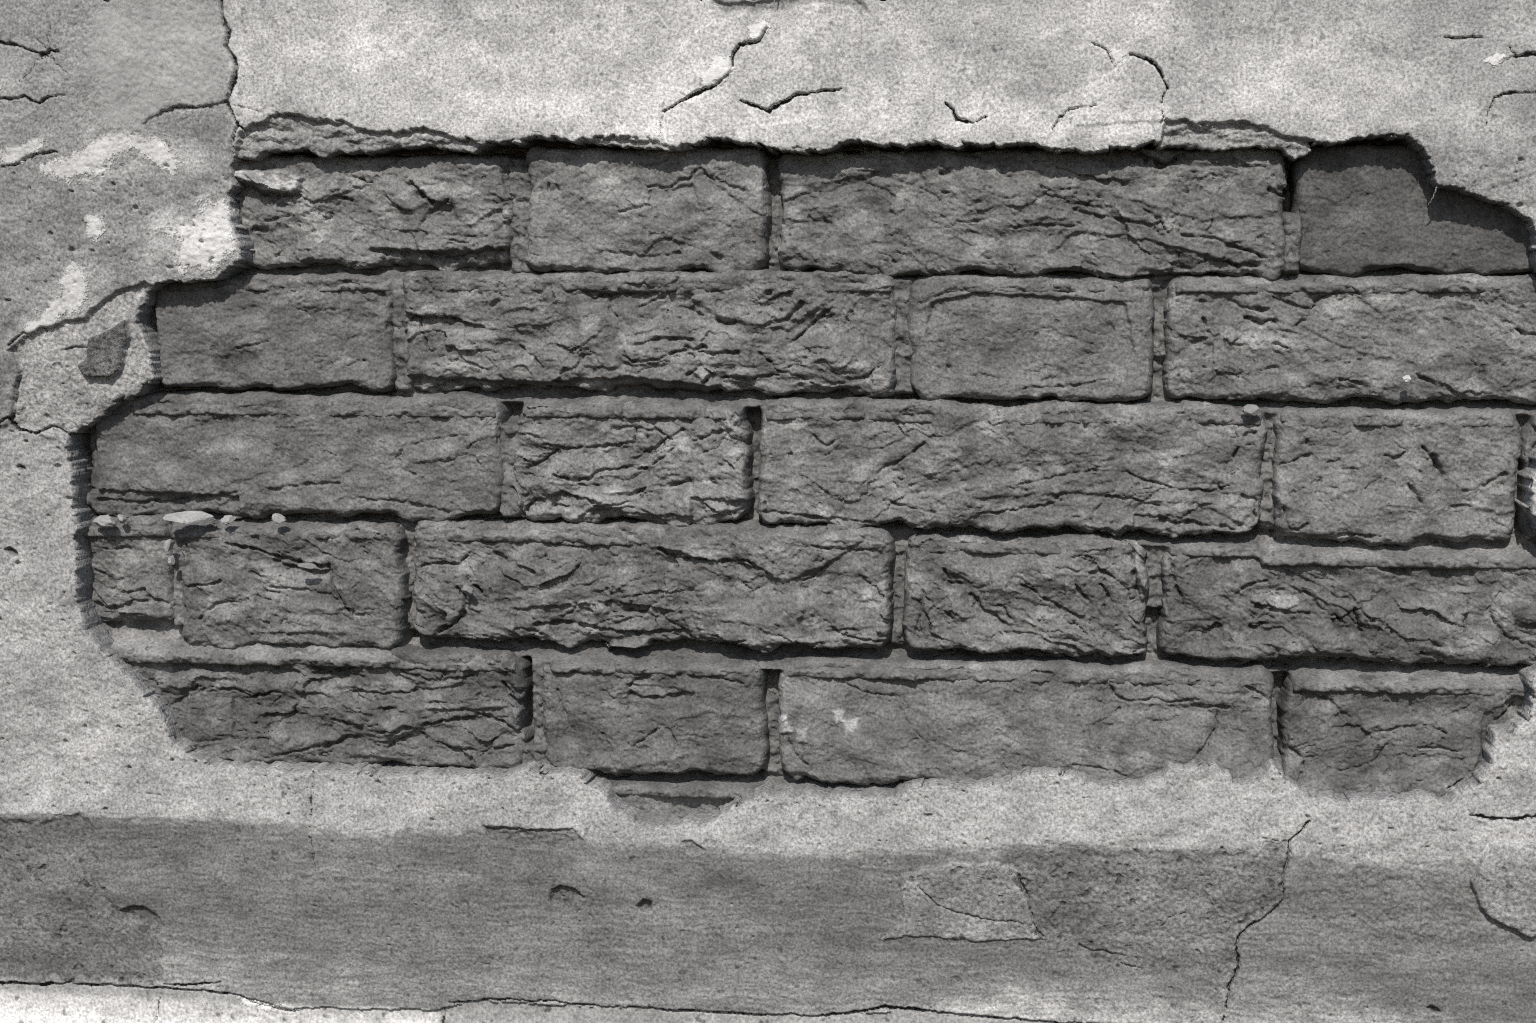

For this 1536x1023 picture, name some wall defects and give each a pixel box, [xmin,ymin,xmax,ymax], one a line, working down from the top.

crack [0,25,71,104]
crack [145,0,259,151]
crack [660,27,841,133]
crack [1444,35,1536,125]
crack [0,336,49,434]
spalling [9,110,1536,854]
crack [1469,813,1536,821]
crack [1222,821,1309,1023]